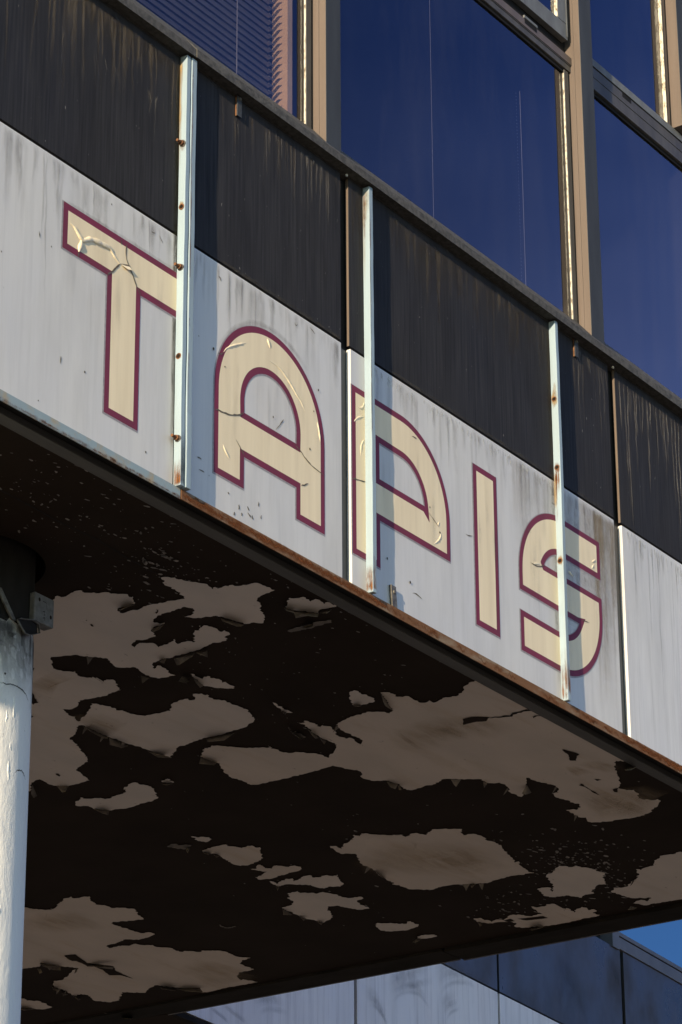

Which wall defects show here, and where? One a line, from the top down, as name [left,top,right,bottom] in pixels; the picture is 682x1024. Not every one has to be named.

crack [108,239,141,295]
crack [215,409,245,456]
rust [166,462,390,611]
peeling [29,577,660,822]
peeling [167,836,369,925]
peeling [330,829,532,890]
peeling [474,852,682,930]
peeling [22,896,254,1002]
peeling [376,921,436,943]
peeling [21,998,51,1011]